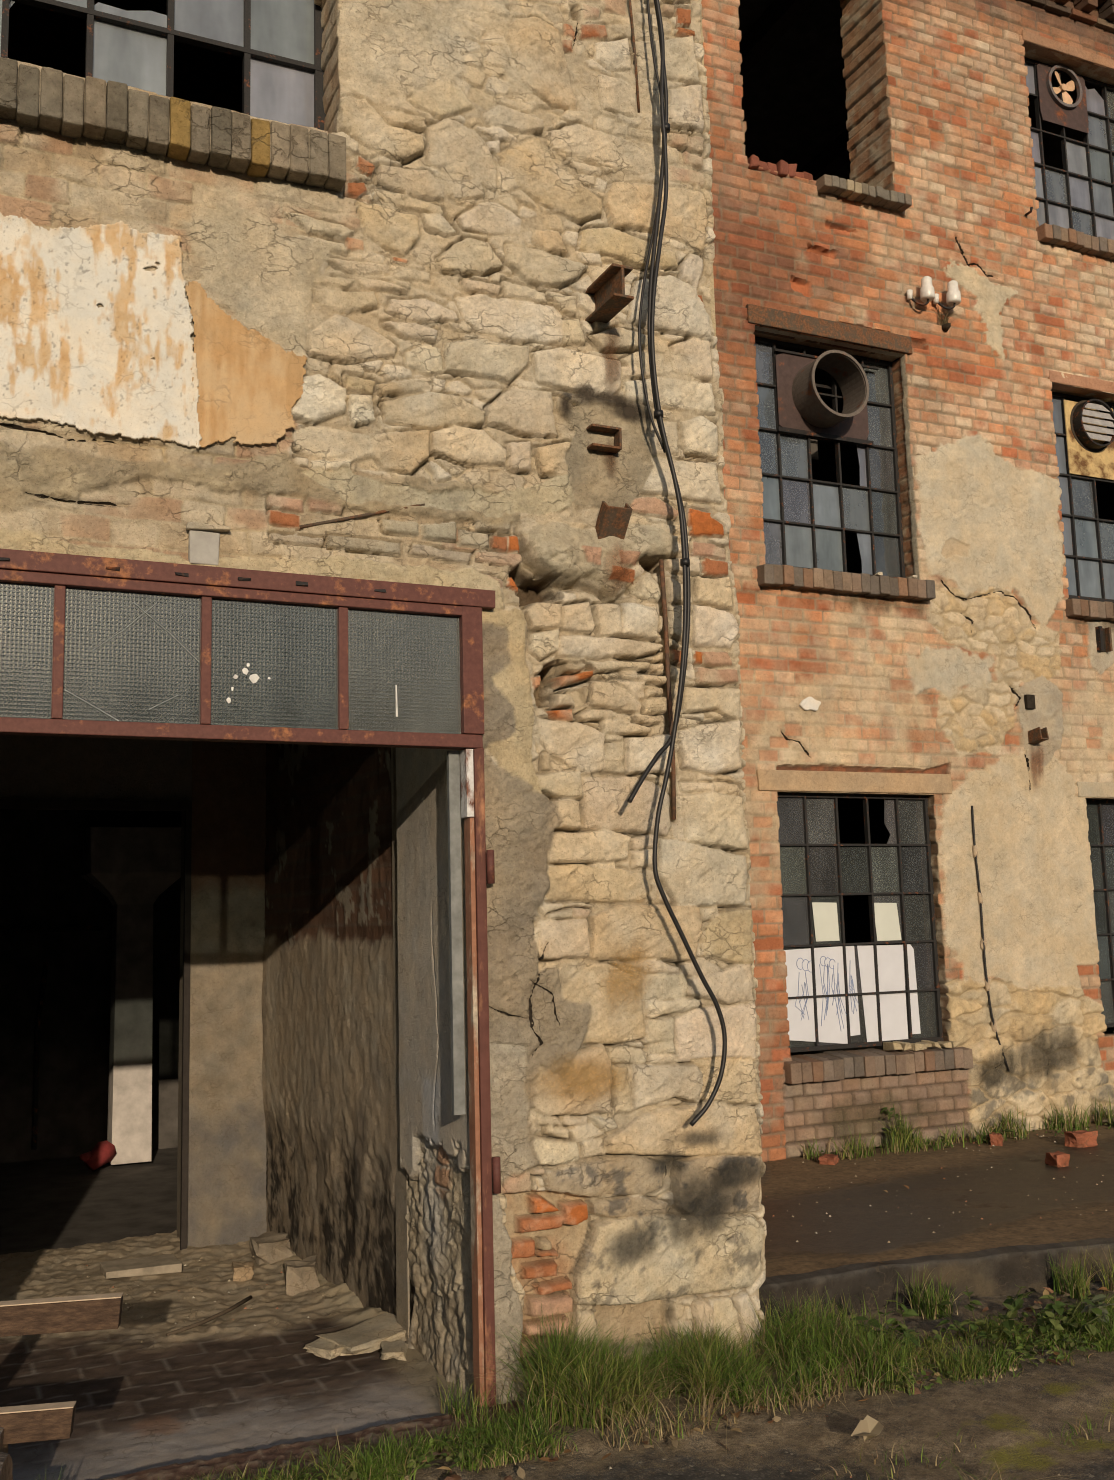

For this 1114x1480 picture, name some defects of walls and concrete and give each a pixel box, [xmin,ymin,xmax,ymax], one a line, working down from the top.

peeling [0,203,523,525]
flaking render [915,434,1066,625]
flaking render [907,645,996,699]
crack [489,943,560,1056]